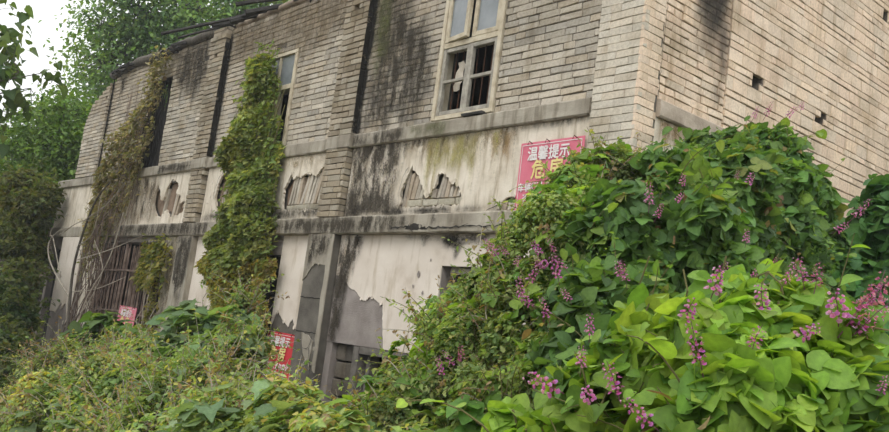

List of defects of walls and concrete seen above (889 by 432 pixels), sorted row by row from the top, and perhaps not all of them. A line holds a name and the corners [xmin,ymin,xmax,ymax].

flaking render [129,180,185,221]
flaking render [281,164,326,212]
damp [268,0,473,341]
flaking render [354,147,462,209]
damp [442,234,486,256]
flaking render [271,234,383,373]